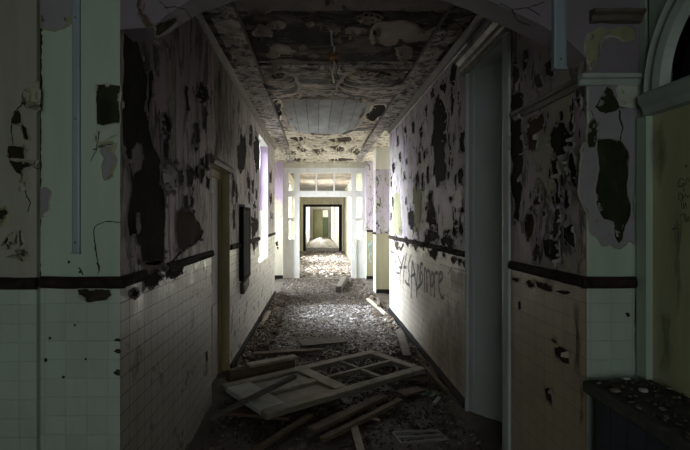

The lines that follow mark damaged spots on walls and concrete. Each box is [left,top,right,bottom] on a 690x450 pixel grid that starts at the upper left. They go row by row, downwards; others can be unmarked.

peeling [252,20,320,62]
peeling [345,12,441,64]
peeling [6,101,41,191]
peeling [94,31,211,300]
peeling [231,124,261,253]
peeling [270,99,361,165]
spalling [363,104,387,124]
peeling [390,62,465,268]
peeling [508,49,639,265]
crack [619,107,629,140]
crack [79,221,120,275]
spalling [76,288,112,303]